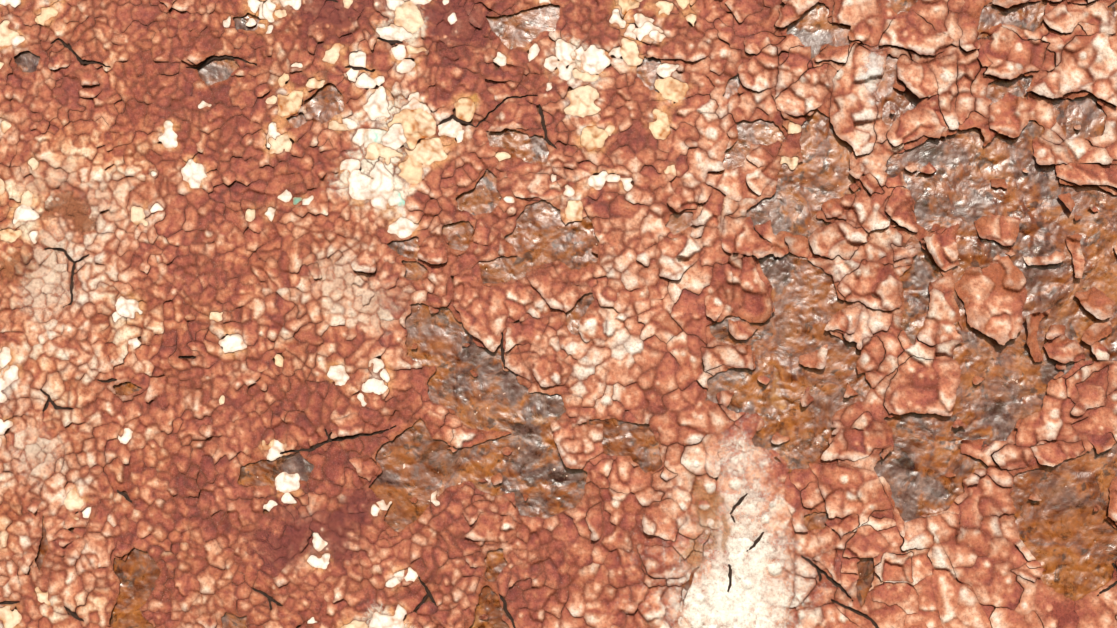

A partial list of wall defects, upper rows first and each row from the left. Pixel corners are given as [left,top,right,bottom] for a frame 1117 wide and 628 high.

crack [1047,0,1087,66]
peeling [158,120,178,148]
peeling [181,159,207,188]
crack [878,197,897,228]
peeling [67,338,181,444]
crack [0,0,788,628]
peeling [215,85,716,628]
peeling [624,0,1117,628]
peeling [0,489,271,628]
crack [782,550,879,628]
crack [897,516,1003,628]
crack [1097,563,1117,596]